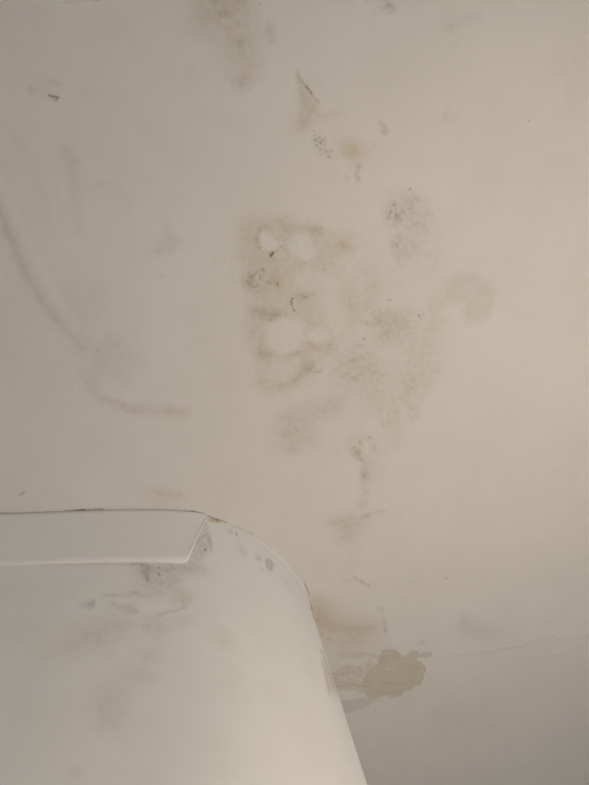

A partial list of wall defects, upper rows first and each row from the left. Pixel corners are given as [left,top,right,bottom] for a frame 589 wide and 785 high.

damp [170,0,280,110]
damp [262,173,502,552]
peeling [327,648,434,716]